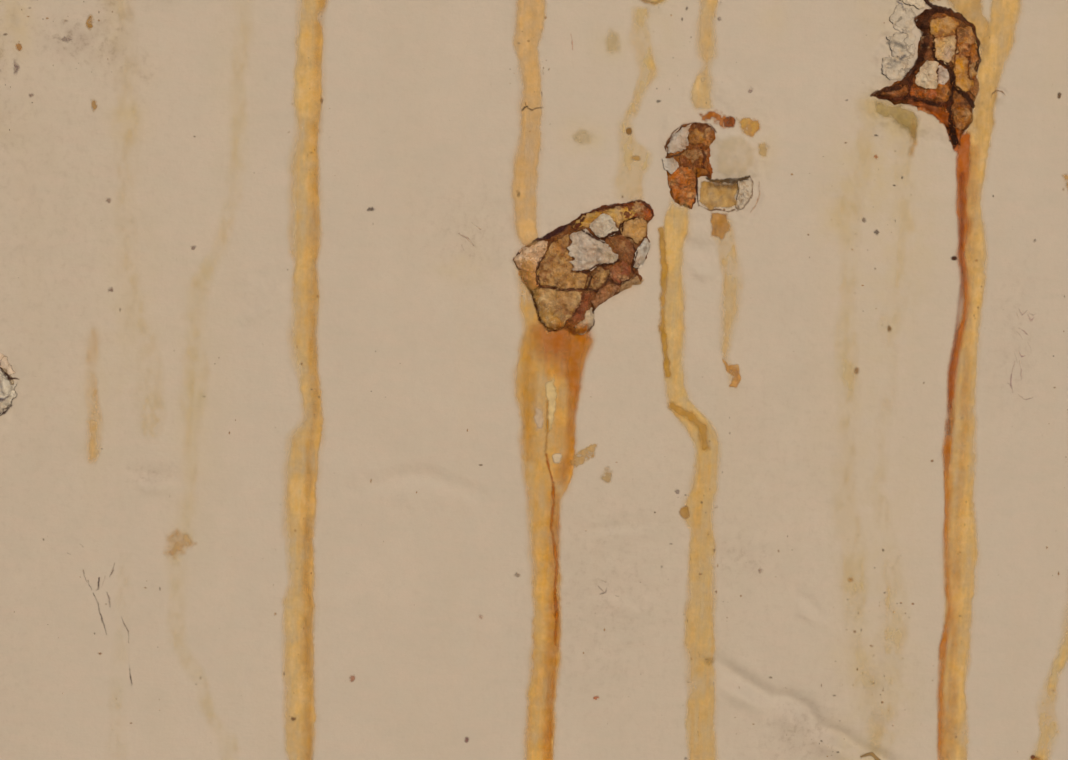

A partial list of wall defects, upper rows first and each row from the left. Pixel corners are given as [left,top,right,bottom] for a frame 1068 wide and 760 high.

corrosion [513,0,545,245]
peeling [501,62,782,351]
peeling [859,0,989,161]
peeling [0,334,34,446]
corrosion [517,261,596,760]
corrosion [938,0,1020,760]